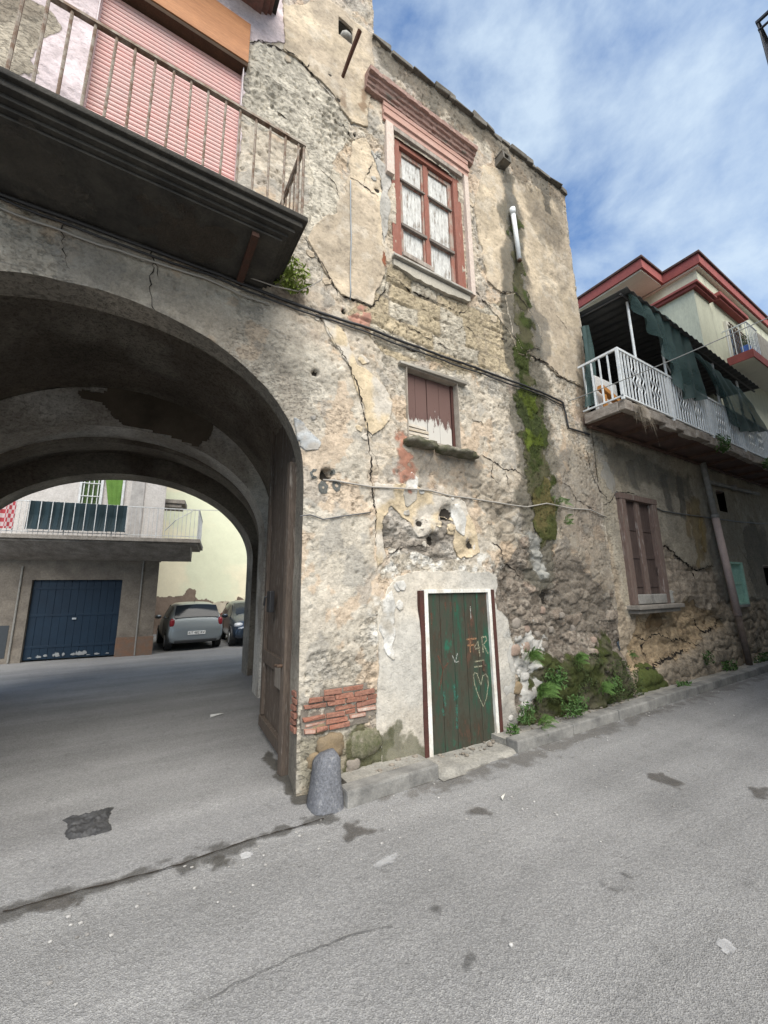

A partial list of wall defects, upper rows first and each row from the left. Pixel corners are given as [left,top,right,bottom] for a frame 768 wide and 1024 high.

flaking render [242,0,584,440]
crack [149,247,158,309]
crack [306,299,432,554]
leakage [498,167,561,592]
flaking render [374,472,480,566]
crack [657,545,713,580]
crack [634,616,722,670]
flaking render [290,682,382,774]